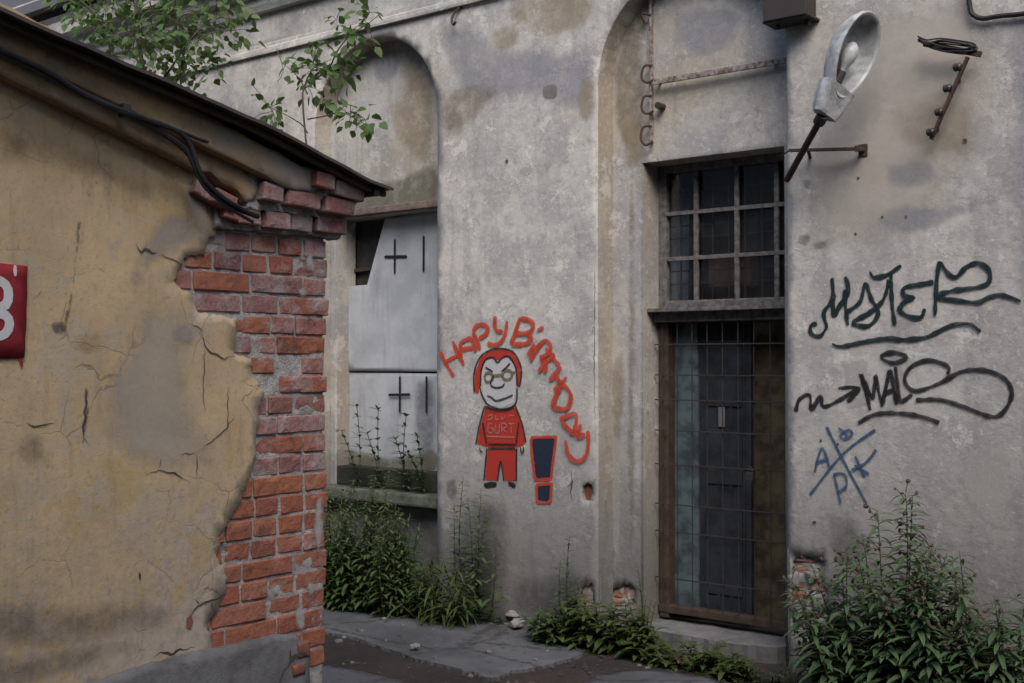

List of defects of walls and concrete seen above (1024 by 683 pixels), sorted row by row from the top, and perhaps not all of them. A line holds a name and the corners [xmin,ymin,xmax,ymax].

crack [81,395,89,442]
crack [148,322,235,482]
spalling [174,171,365,683]
spalling [585,484,593,500]
crack [156,594,225,656]
spalling [581,578,635,610]
spalling [787,548,842,642]